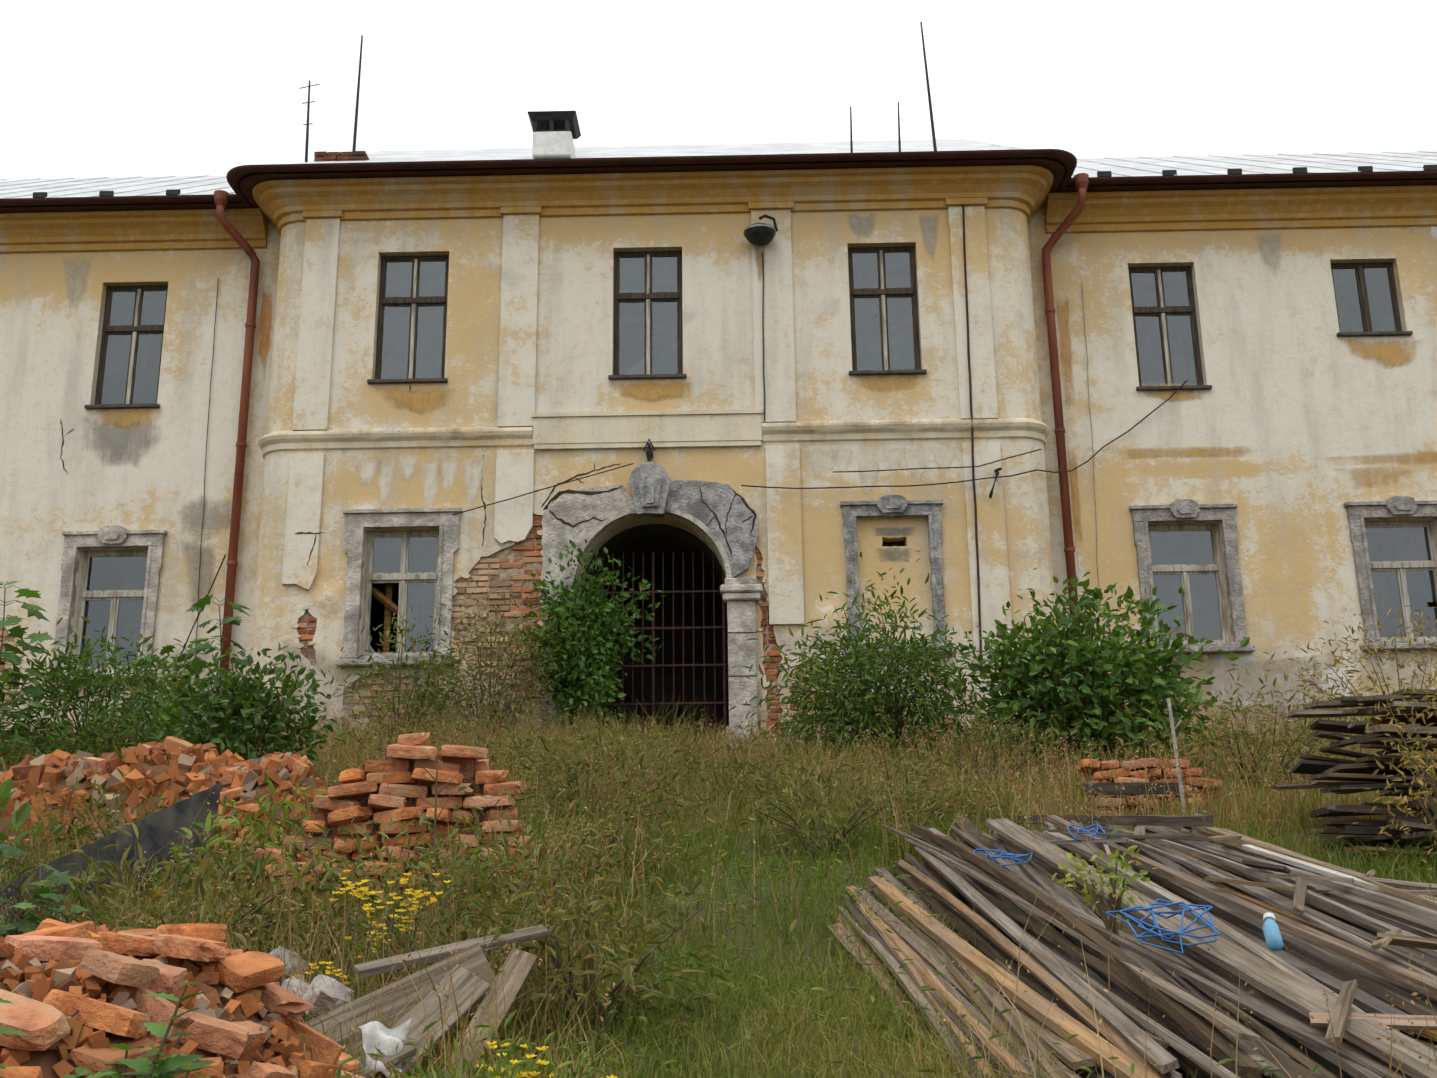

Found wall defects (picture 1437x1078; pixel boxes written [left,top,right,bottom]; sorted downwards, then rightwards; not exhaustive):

leakage [93,411,151,462]
spalling [292,606,441,730]
spalling [451,513,543,705]
spalling [755,546,885,744]